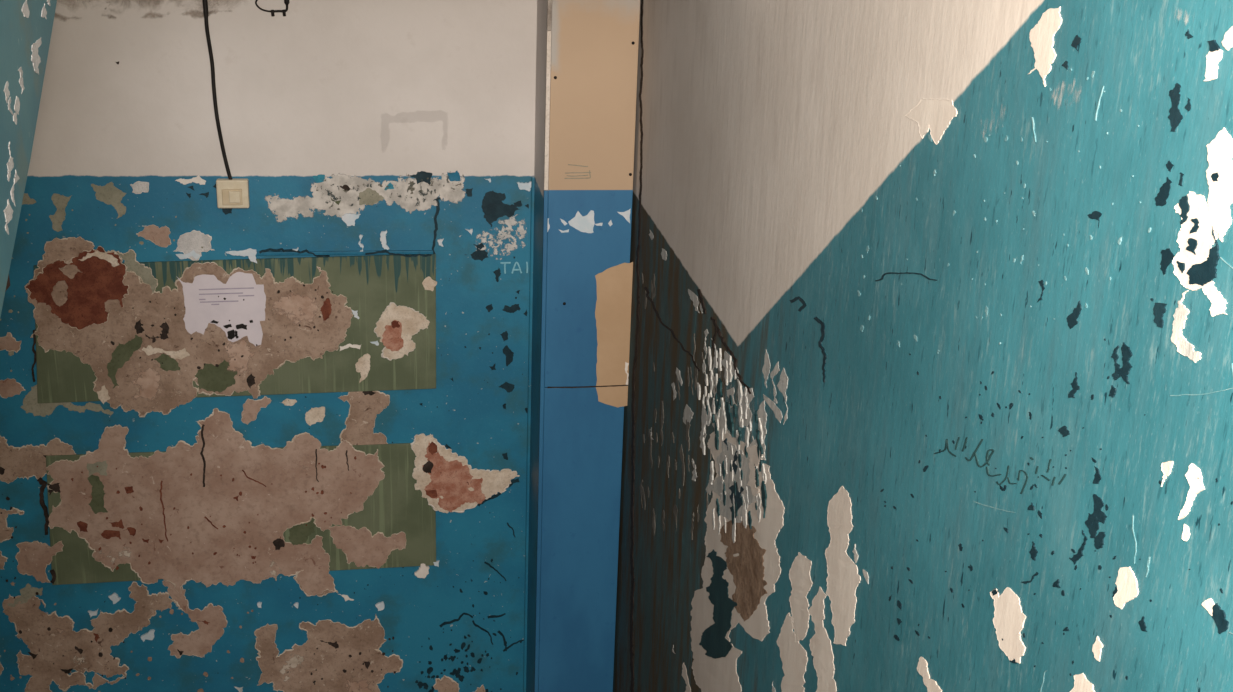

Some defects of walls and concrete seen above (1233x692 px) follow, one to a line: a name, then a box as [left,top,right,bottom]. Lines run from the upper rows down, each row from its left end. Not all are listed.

spalling [4,37,42,125]
spalling [1168,83,1191,132]
peeling [1204,26,1233,81]
spalling [3,141,36,235]
peeling [91,181,149,226]
peeling [265,171,531,251]
spalling [547,208,631,233]
peeling [595,262,633,407]
spalling [1054,300,1088,329]
peeling [0,193,439,692]
spalling [411,433,519,513]
peeling [682,429,861,692]